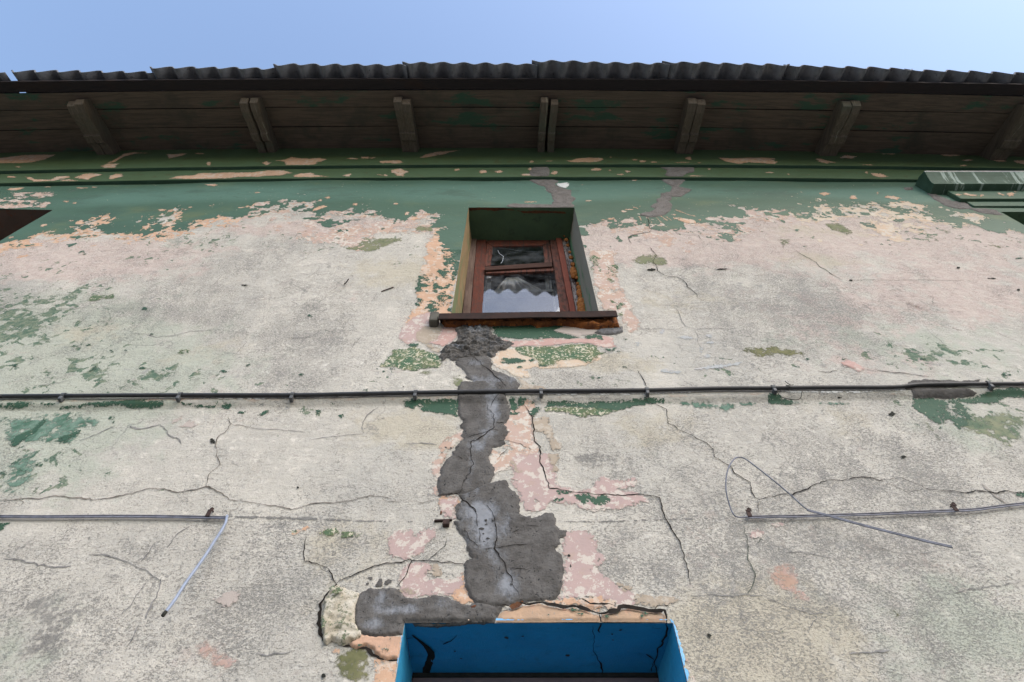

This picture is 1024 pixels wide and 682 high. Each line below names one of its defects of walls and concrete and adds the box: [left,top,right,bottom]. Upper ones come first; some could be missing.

peeling [0,152,142,209]
peeling [167,153,326,186]
peeling [346,157,408,176]
peeling [589,191,990,253]
peeling [0,192,461,352]
crack [628,219,723,347]
peeling [489,249,649,512]
peeling [432,429,463,519]
crack [3,328,1022,673]
peeling [387,528,474,604]
peeling [544,530,678,618]
peeling [372,658,397,682]